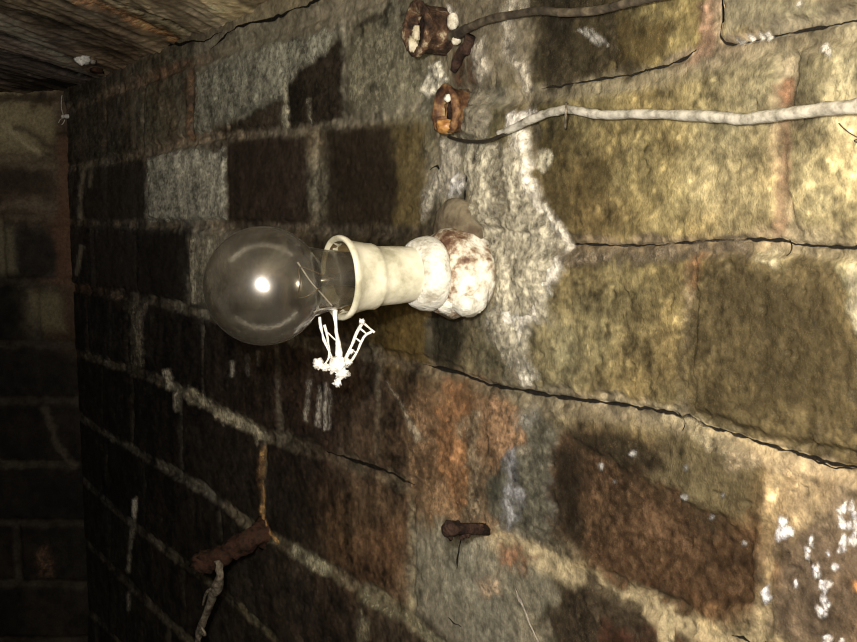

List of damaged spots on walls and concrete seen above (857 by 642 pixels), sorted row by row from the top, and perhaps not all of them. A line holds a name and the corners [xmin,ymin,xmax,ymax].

crack [168,0,319,49]
crack [720,0,857,46]
water stain [420,61,448,96]
water stain [471,39,488,83]
crack [542,50,696,89]
water stain [421,109,572,386]
crack [571,237,857,256]
crack [424,364,857,469]
rust [406,381,526,541]
rust [257,446,279,544]
water stain [761,587,771,603]
water stain [775,500,857,642]